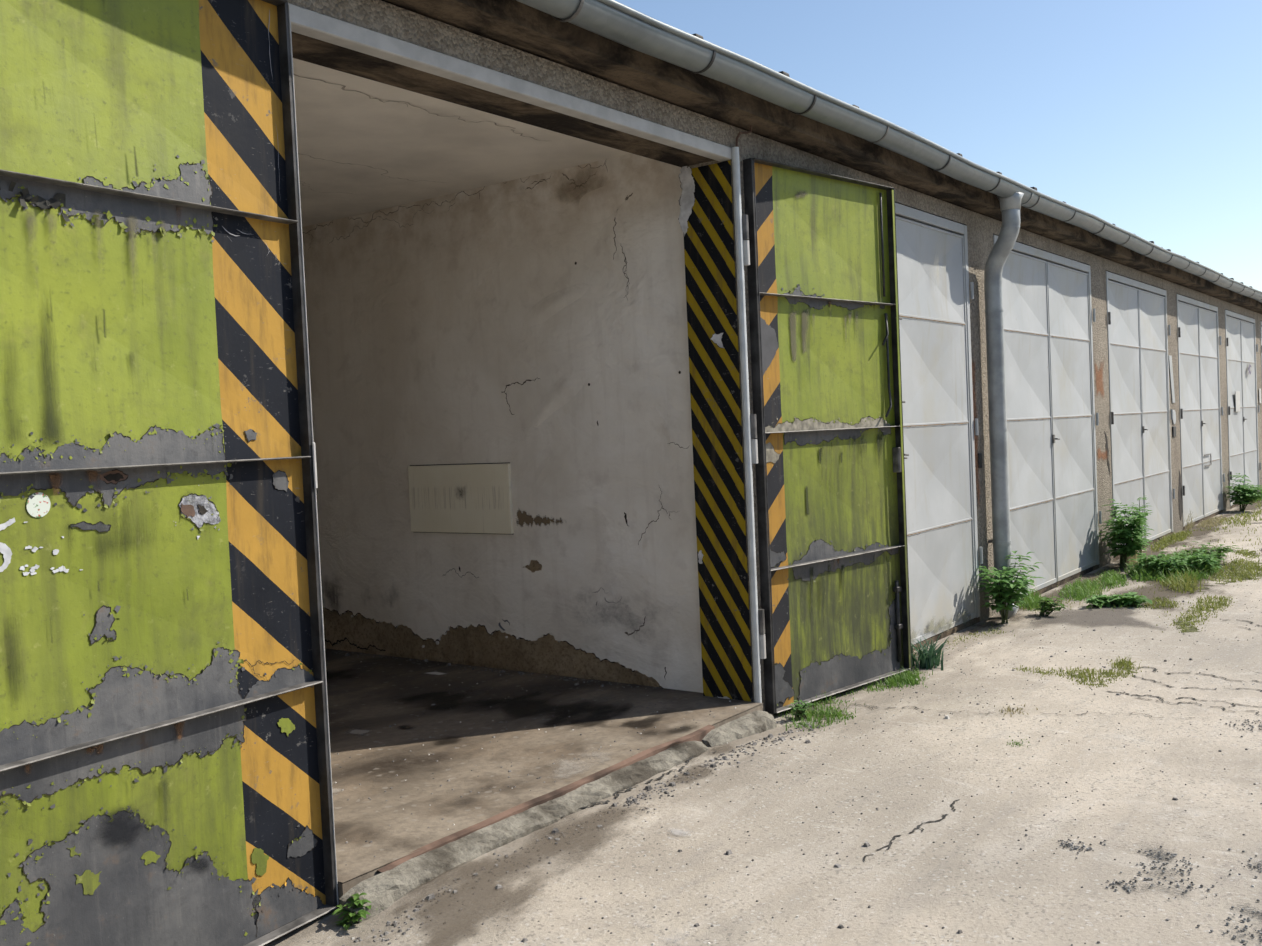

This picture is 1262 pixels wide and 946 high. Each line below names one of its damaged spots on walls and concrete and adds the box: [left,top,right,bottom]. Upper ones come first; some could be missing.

peeling [0,155,223,242]
crack [613,193,633,295]
damp [45,346,59,439]
rust [1095,366,1104,395]
peeling [764,414,892,464]
peeling [0,423,233,576]
spalling [323,607,663,688]
crack [592,588,646,636]
peeling [0,641,314,814]
crack [1040,666,1262,718]
crack [863,799,960,862]
peeling [0,806,324,946]